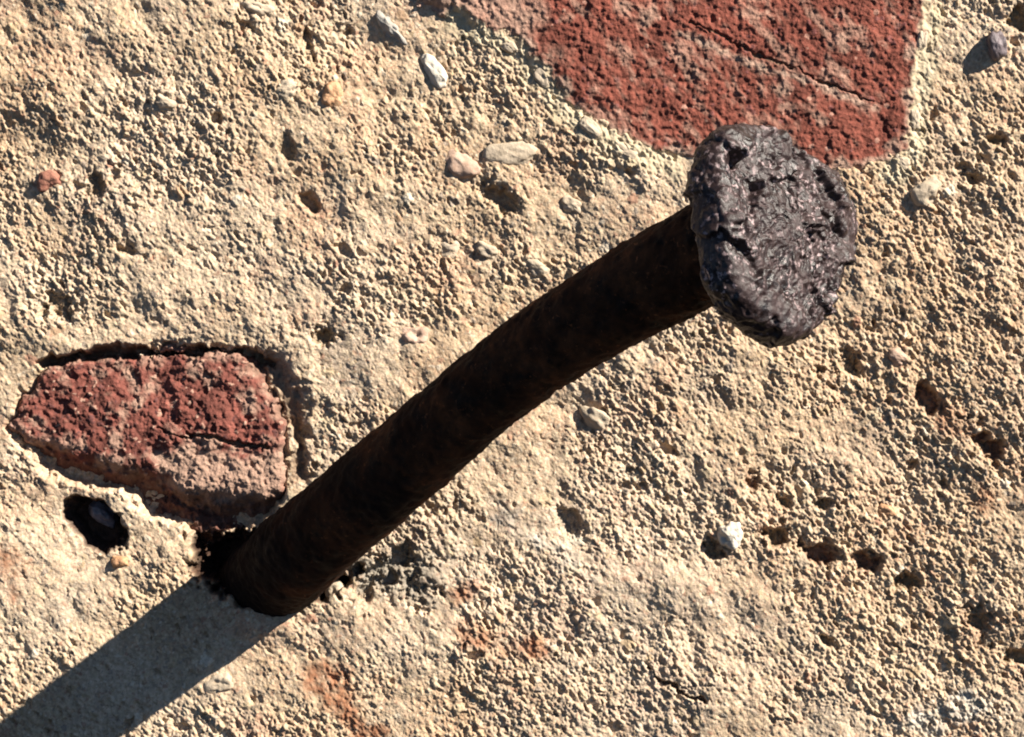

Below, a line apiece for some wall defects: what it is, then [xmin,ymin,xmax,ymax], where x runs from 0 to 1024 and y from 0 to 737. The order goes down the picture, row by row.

crack [688,22,861,100]